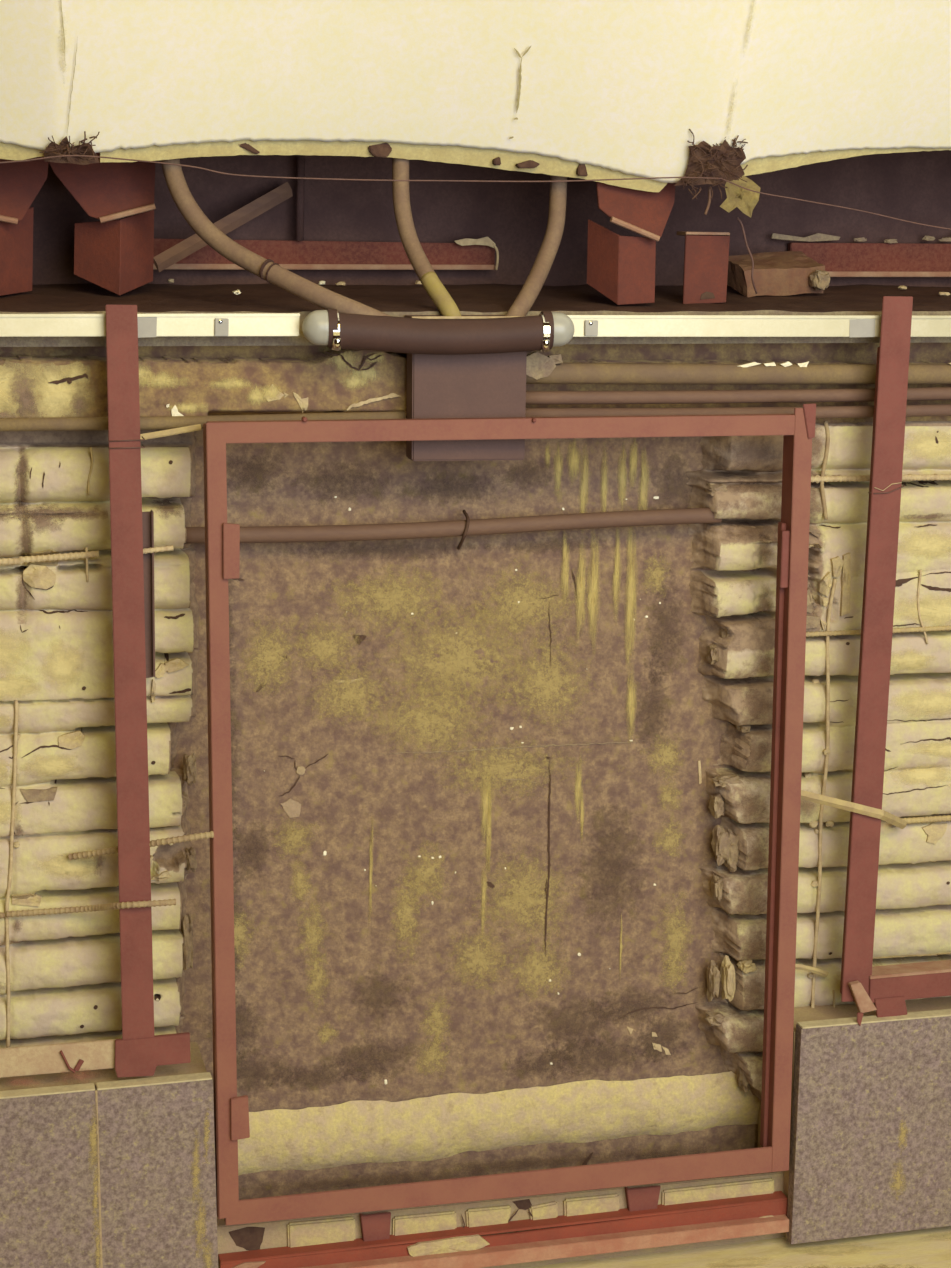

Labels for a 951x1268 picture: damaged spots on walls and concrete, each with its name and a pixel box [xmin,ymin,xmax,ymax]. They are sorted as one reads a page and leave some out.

crack [509,46,531,139]
spalling [40,131,100,165]
spalling [674,129,760,217]
flaking render [455,237,499,270]
water stain [512,444,649,513]
flaking render [0,550,99,589]
water stain [613,532,665,663]
crack [895,571,951,592]
water stain [238,539,598,998]
water stain [627,677,685,855]
crack [883,718,951,795]
crack [544,757,552,957]